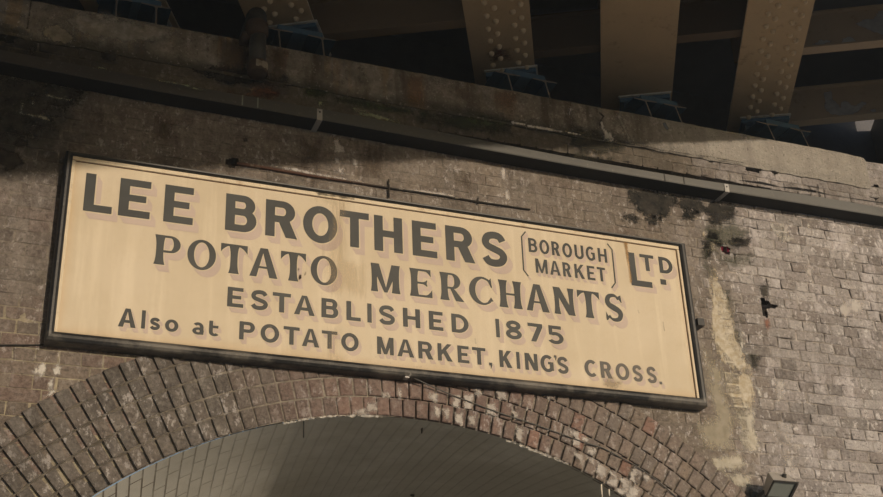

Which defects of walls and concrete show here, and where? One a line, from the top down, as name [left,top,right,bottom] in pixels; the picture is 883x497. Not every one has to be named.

leakage [709,268,762,497]